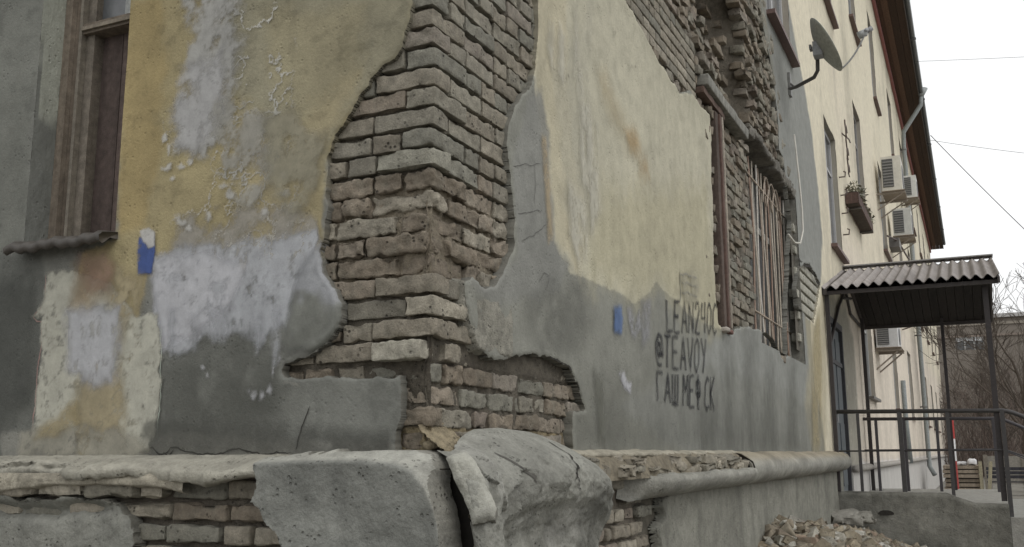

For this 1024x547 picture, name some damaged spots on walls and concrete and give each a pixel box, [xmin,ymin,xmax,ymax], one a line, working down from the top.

spalling [162,0,580,451]
peeling [18,228,162,456]
crack [496,453,537,482]
spalling [583,454,750,482]